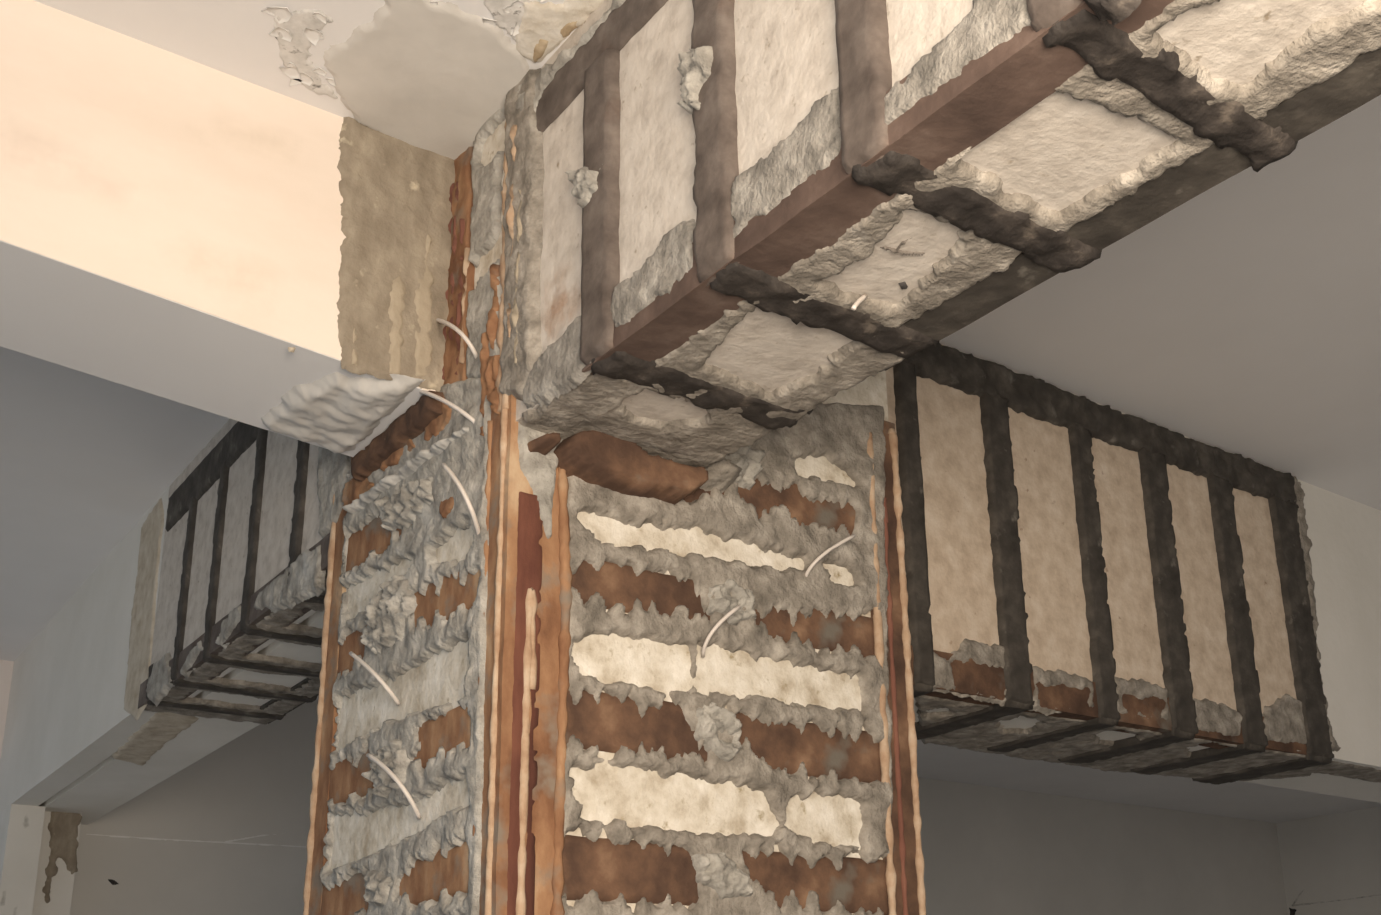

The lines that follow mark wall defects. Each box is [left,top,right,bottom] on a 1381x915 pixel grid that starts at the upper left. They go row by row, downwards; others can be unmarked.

peeling [483,0,604,63]
spalling [112,419,323,766]
spalling [886,367,896,431]
spalling [916,376,999,653]
spalling [1008,407,1093,682]
spalling [1091,438,1165,688]
spalling [1167,464,1237,711]
spalling [1232,488,1297,714]
spalling [1293,476,1381,783]
spalling [42,812,82,903]